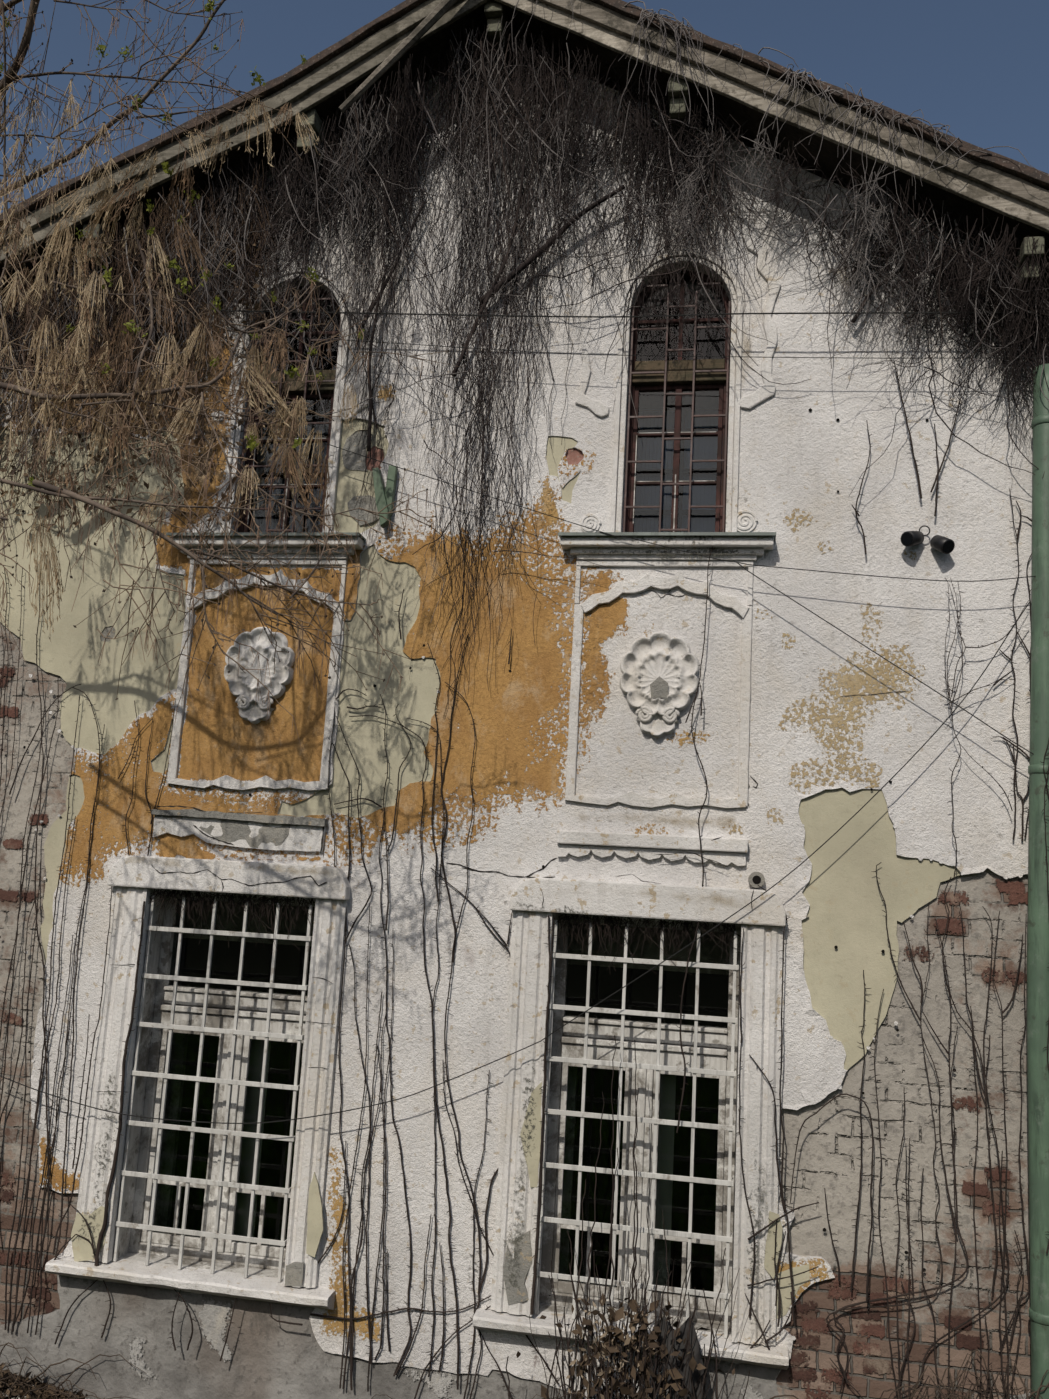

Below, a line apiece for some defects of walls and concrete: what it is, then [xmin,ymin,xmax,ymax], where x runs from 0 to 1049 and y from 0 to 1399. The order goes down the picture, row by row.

peeling [0,297,654,1399]
peeling [633,431,716,532]
spalling [702,603,1031,1399]